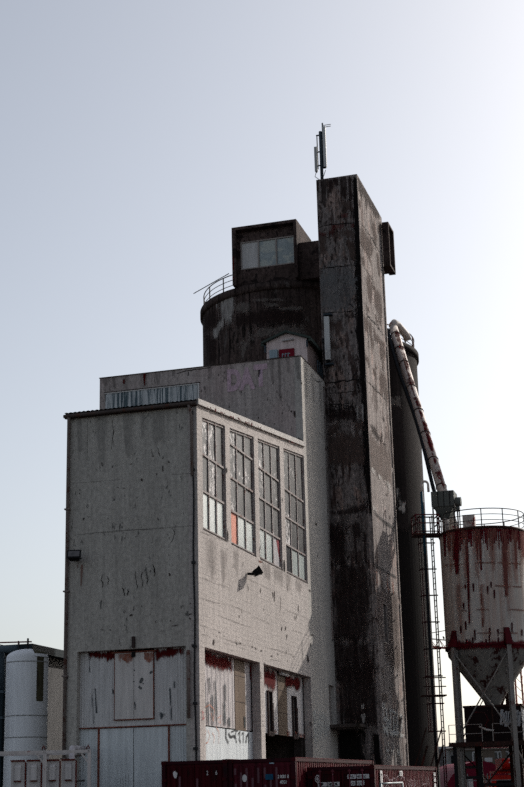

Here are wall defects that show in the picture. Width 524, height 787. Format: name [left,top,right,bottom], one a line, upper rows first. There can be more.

leakage [204,297,301,361]
rust [395,329,445,488]
leakage [316,177,435,767]
rust [443,528,524,650]
rust [88,647,183,663]
rust [205,651,232,672]
rust [264,667,304,691]